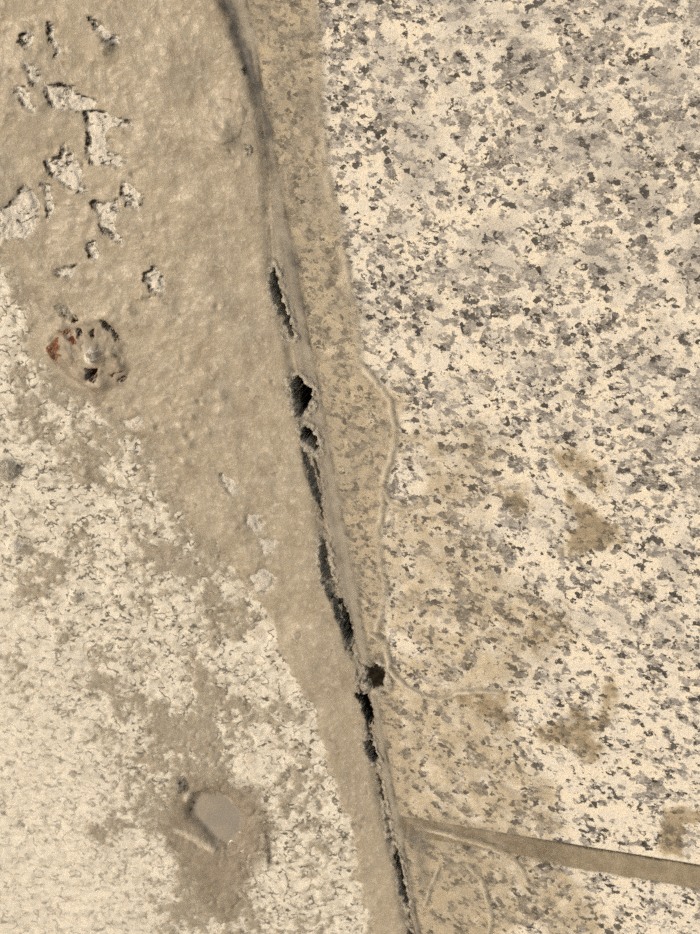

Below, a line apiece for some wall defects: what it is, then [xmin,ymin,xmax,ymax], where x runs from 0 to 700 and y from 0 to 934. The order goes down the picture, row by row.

peeling [16,29,35,50]
peeling [45,21,61,58]
peeling [86,16,120,46]
peeling [0,61,143,262]
peeling [54,264,76,281]
peeling [141,265,165,296]
crack [262,259,301,344]
crack [300,447,413,932]